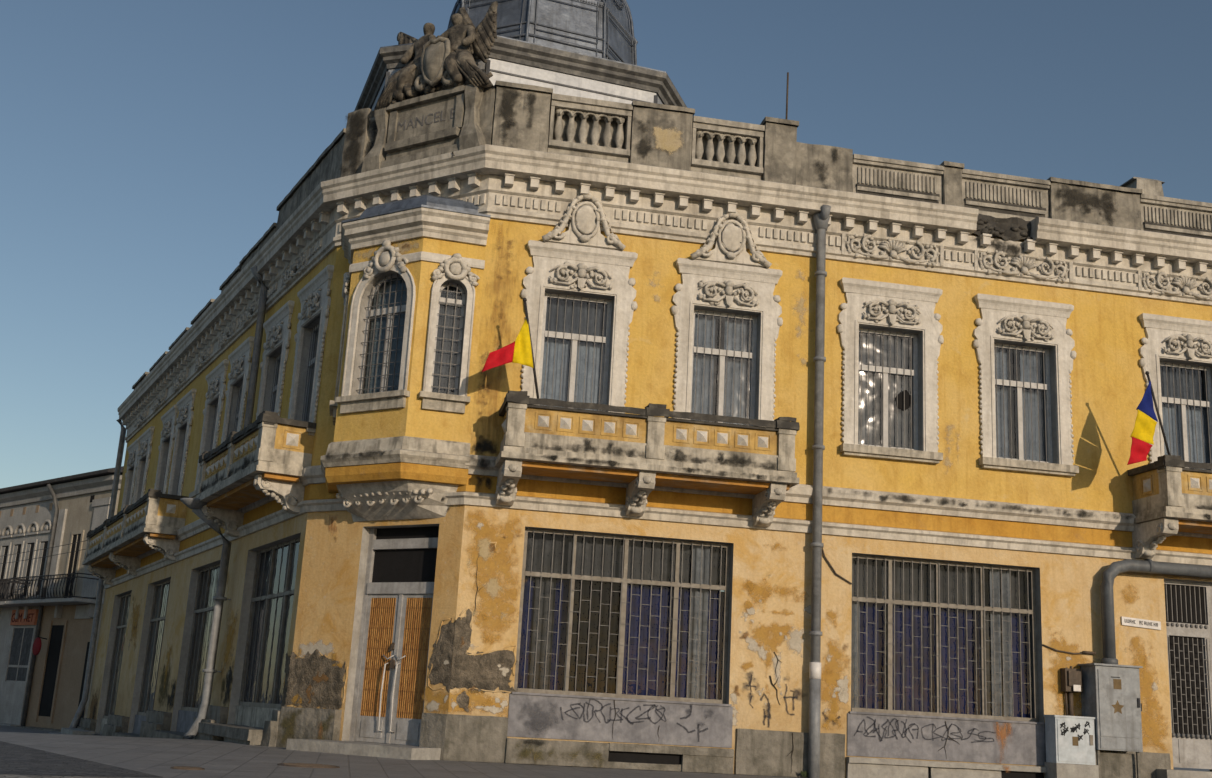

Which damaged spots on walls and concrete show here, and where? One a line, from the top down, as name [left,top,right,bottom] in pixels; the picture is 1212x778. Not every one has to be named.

water stain [638,121,682,158]
water stain [1057,186,1116,226]
water stain [535,439,635,466]
water stain [674,450,776,480]
flaking render [423,512,520,714]
peeling [739,579,811,696]
flaking render [281,640,348,710]
peeling [821,641,849,727]
peeling [730,685,739,726]